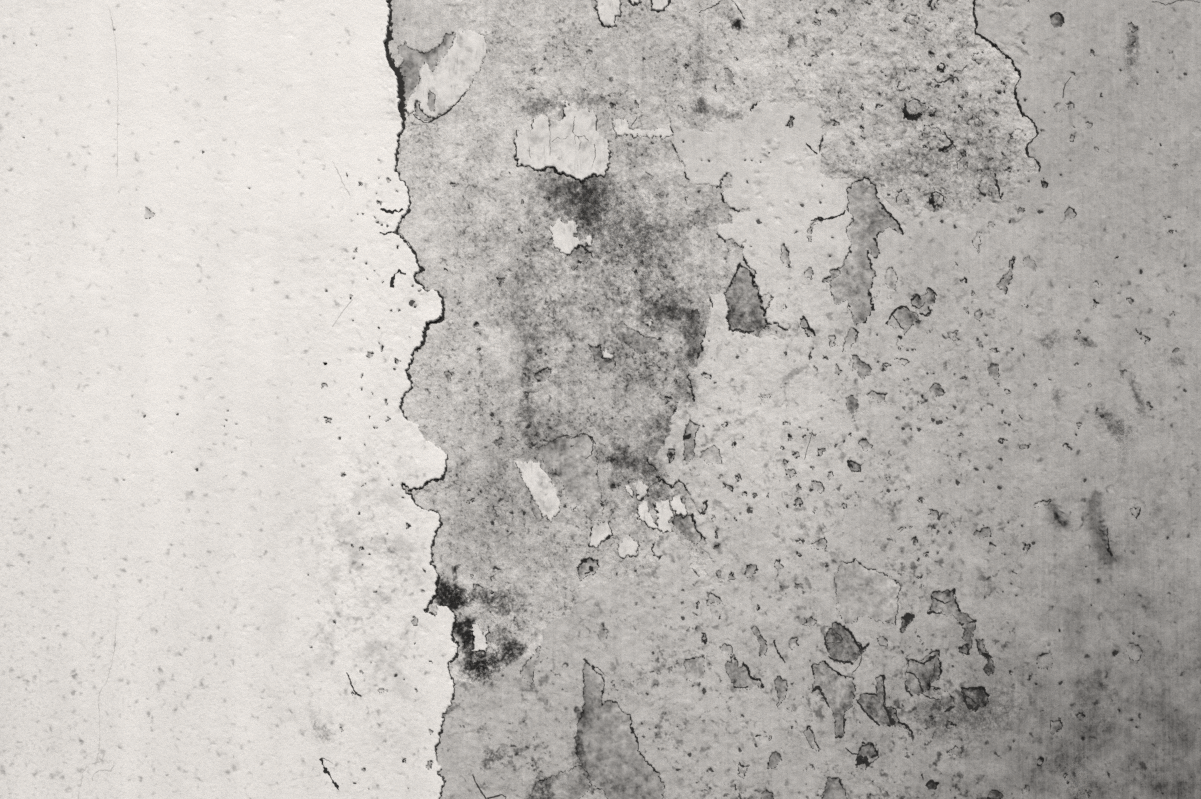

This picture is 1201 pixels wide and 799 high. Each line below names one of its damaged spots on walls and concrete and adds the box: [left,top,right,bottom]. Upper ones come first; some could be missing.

water stain [549,175,638,230]
water stain [645,300,702,359]
spalling [366,0,1074,688]
water stain [614,450,662,496]
water stain [436,566,526,682]
peeling [825,526,1013,729]
peeling [683,633,788,708]
spalling [529,661,665,799]
peeling [735,731,782,790]
peeling [822,777,848,799]
peeling [811,660,913,770]
peeling [921,774,956,799]